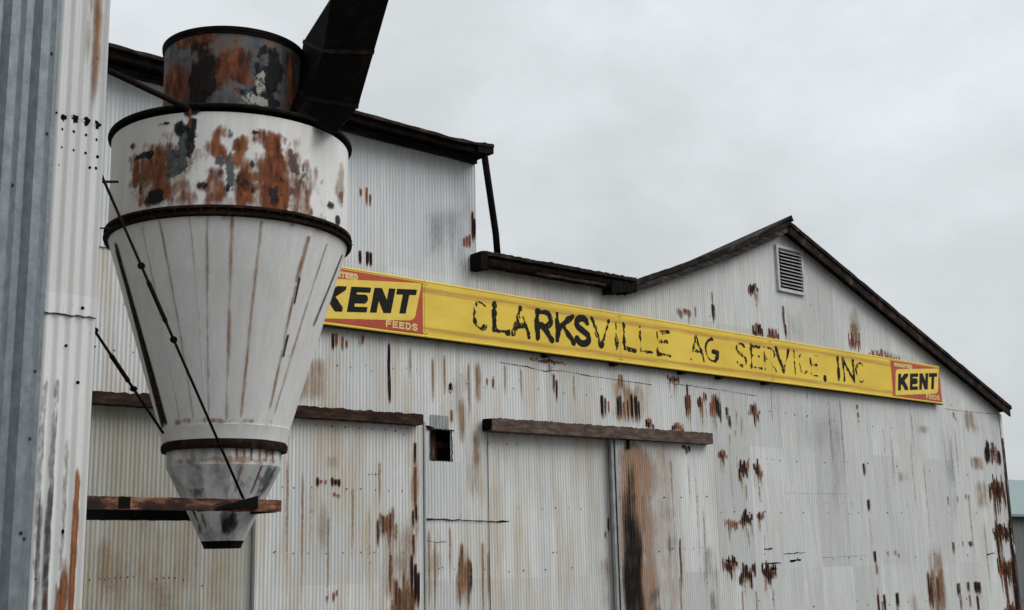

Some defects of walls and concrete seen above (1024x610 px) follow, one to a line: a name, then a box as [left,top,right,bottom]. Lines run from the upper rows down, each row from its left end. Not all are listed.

rust [163,33,256,127]
rust [205,126,318,228]
rust [600,375,654,429]
rust [43,470,80,610]
rust [214,448,341,532]
rust [377,443,436,610]
rust [449,528,490,608]
rust [604,443,658,610]
rust [718,450,763,497]
rust [725,509,764,531]
rust [722,555,777,610]
rust [965,441,1019,610]